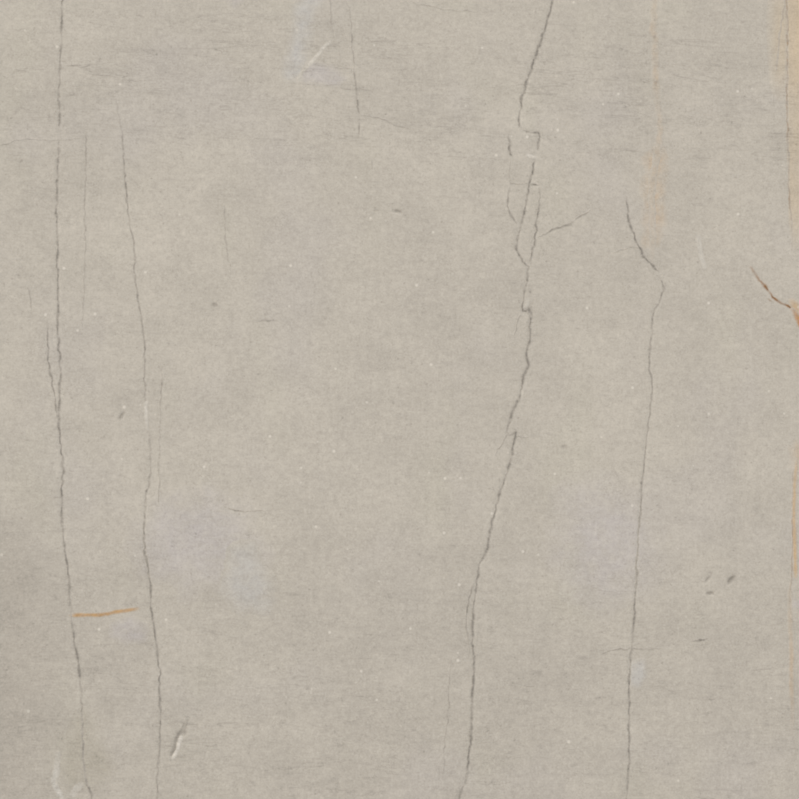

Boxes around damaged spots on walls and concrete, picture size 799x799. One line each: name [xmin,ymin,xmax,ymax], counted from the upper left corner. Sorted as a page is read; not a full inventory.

water stain [0,507,120,799]
crack [27,0,94,799]
rust [69,606,140,618]
crack [114,98,163,799]
crack [457,0,591,799]
crack [599,195,666,799]